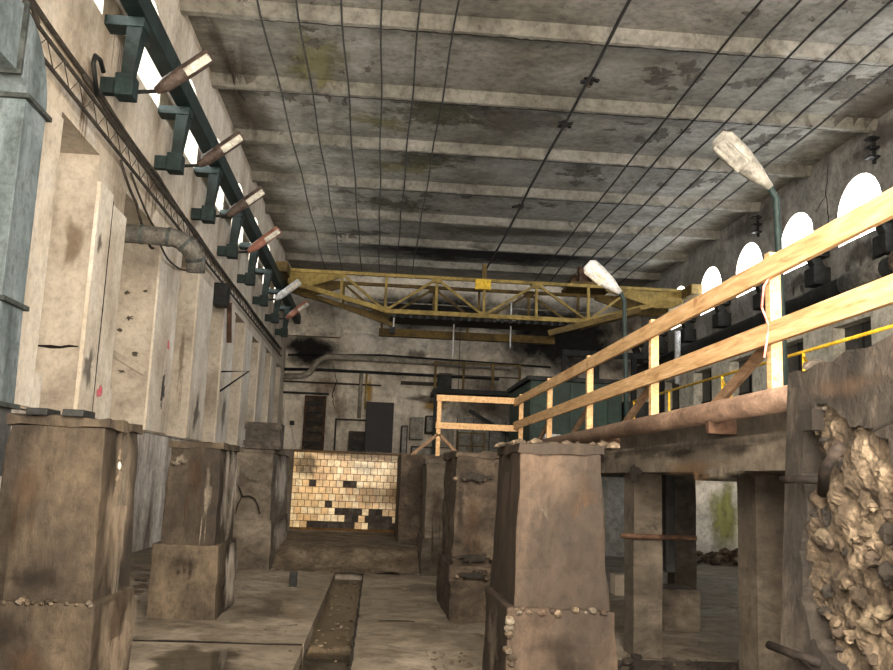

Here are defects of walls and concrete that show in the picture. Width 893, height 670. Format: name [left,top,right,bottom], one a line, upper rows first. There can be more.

water stain [392,152,465,168]
peeling [307,500,395,530]
spalling [805,404,893,670]
spalling [0,597,93,608]